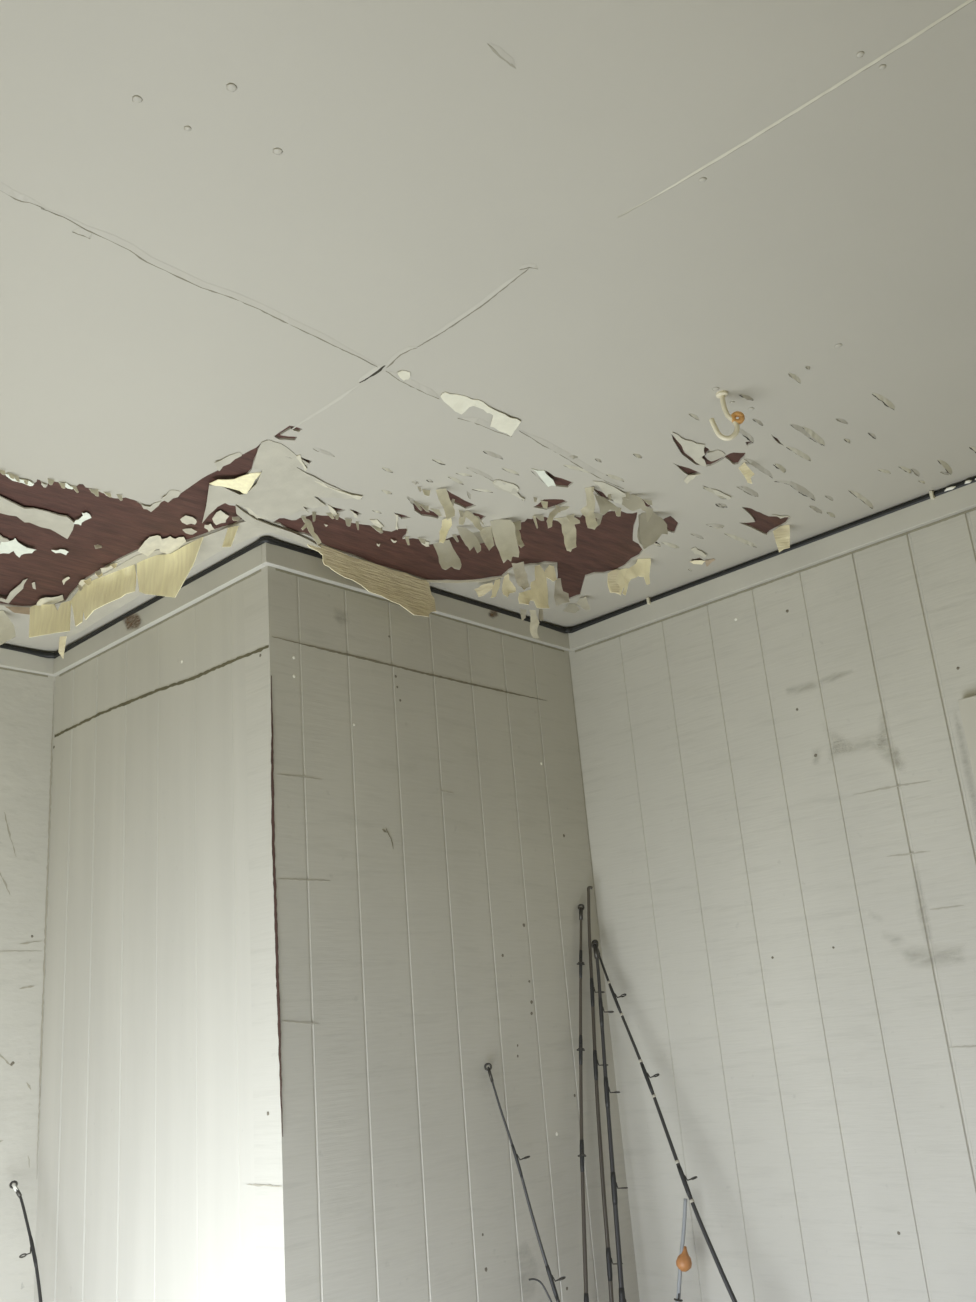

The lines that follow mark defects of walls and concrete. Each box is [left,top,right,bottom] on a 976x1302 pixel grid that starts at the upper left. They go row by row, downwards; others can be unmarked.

peeling [440,392,521,436]
peeling [0,419,835,658]